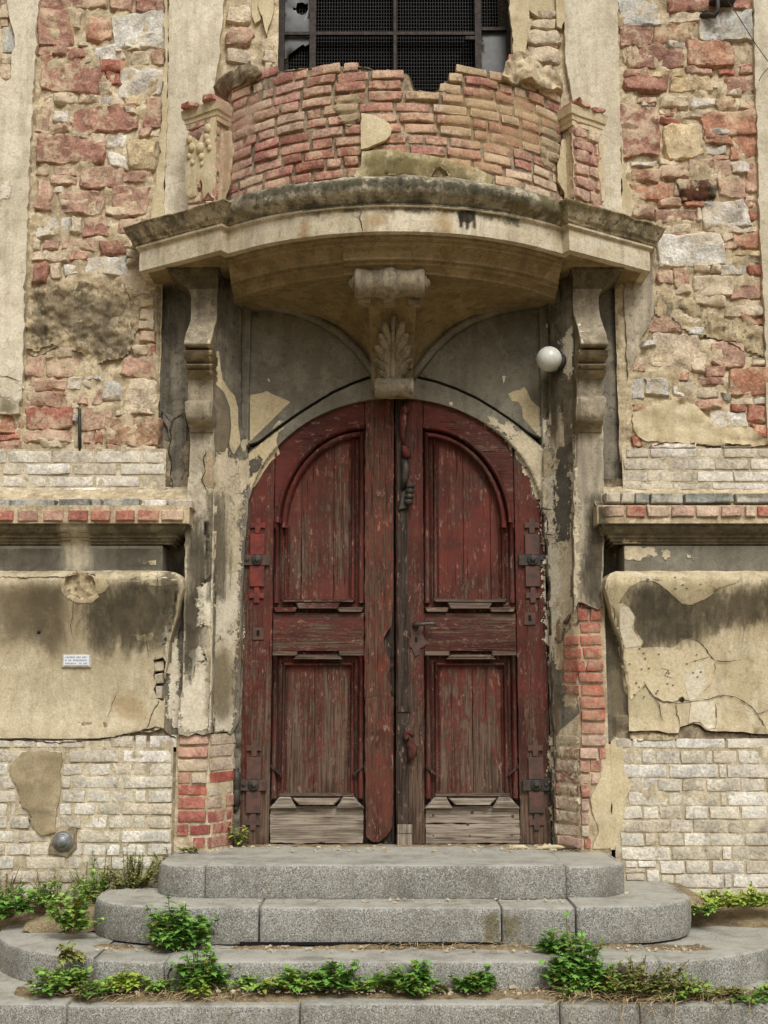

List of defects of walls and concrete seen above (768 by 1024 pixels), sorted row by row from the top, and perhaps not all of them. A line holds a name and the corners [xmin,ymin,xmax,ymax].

leakage [301,199,519,228]
spalling [25,281,141,363]
leakage [158,292,170,342]
spalling [655,291,765,360]
peeling [133,340,290,737]
peeling [485,323,768,741]
leakage [0,519,208,679]
leakage [631,584,768,648]
crack [6,686,176,744]
crack [645,638,768,730]
spalling [545,732,585,838]